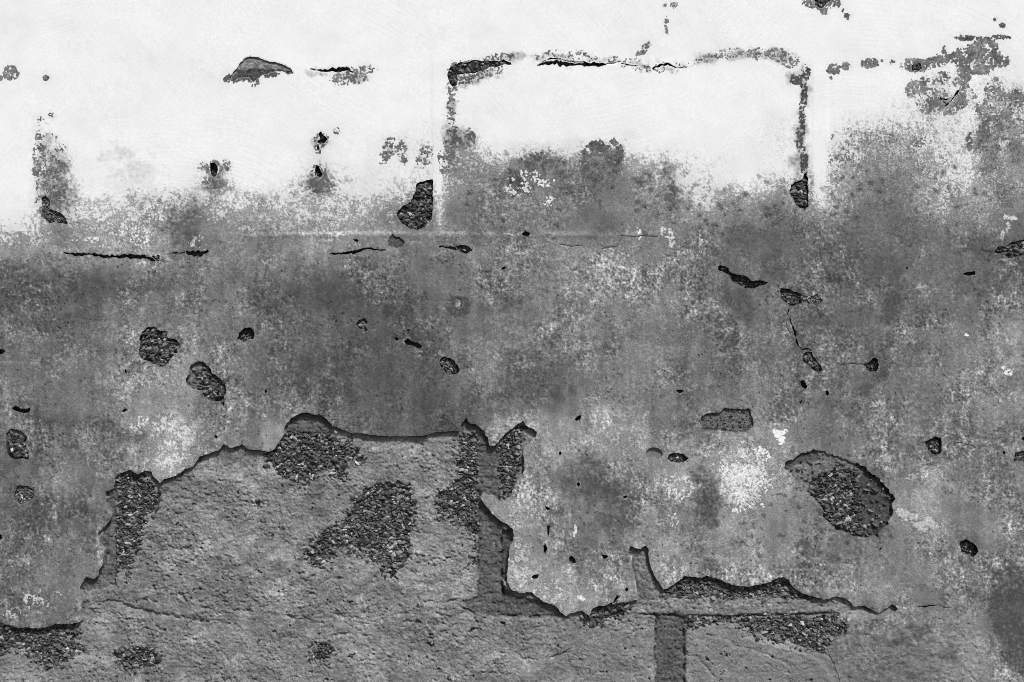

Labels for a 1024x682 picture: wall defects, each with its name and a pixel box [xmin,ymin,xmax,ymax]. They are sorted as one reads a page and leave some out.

spalling [223,55,295,87]
peeling [826,18,1024,182]
spalling [379,52,514,249]
peeling [496,137,625,205]
peeling [536,41,811,211]
crack [63,250,209,263]
spalling [717,264,824,308]
spalling [138,325,182,367]
crack [786,305,812,354]
spalling [185,360,227,408]
spalling [0,407,919,682]